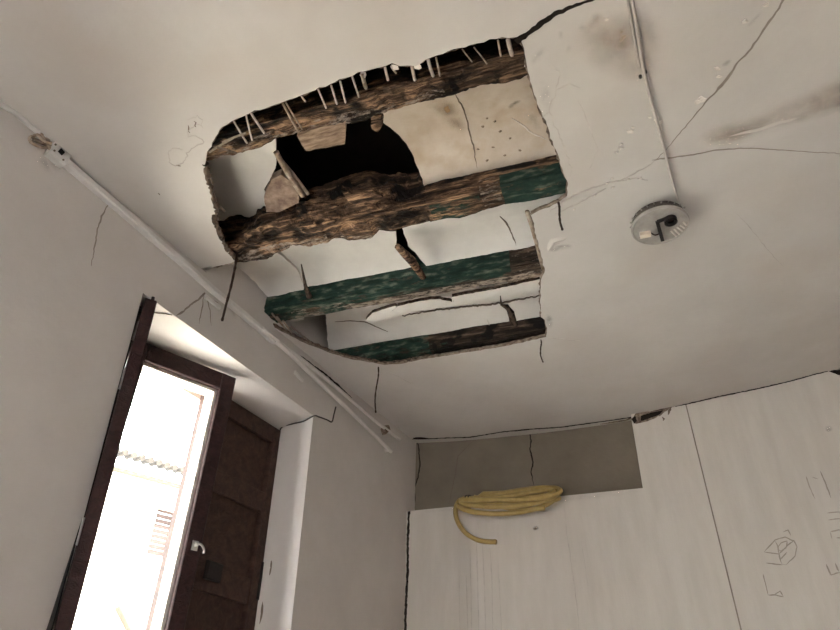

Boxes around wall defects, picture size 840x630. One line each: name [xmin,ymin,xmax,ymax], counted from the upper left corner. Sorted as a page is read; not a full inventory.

crack [91,205,108,265]
flaking render [168,43,488,262]
flaking render [271,240,547,364]
flaking render [497,37,568,230]
crack [514,0,594,44]
crack [550,0,838,214]
crack [675,371,828,407]
crack [404,417,631,630]